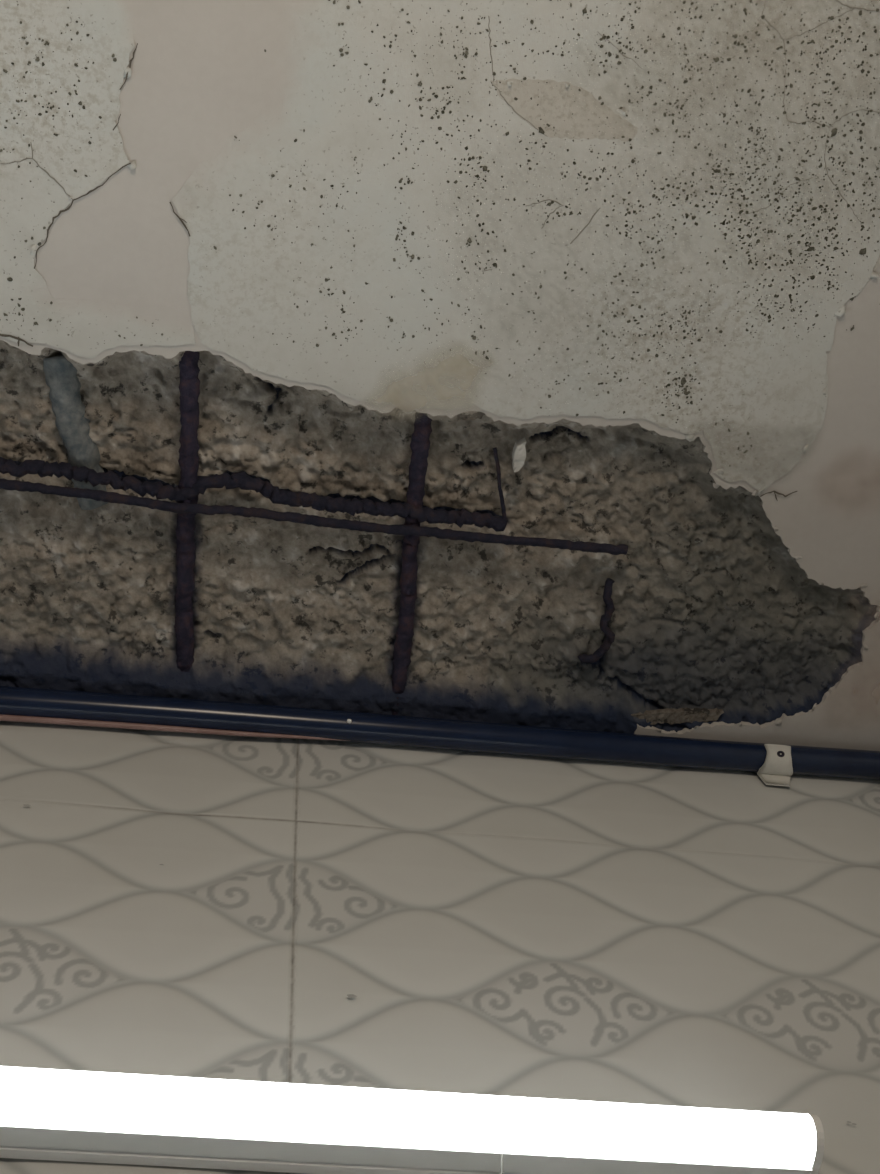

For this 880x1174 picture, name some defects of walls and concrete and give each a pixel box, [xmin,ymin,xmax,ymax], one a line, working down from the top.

water stain [3,21,94,168]
crack [113,43,138,130]
crack [1,142,131,269]
water stain [229,165,307,246]
water stain [333,0,880,423]
water stain [0,272,71,339]
water stain [310,265,374,347]
peeling [0,0,880,734]